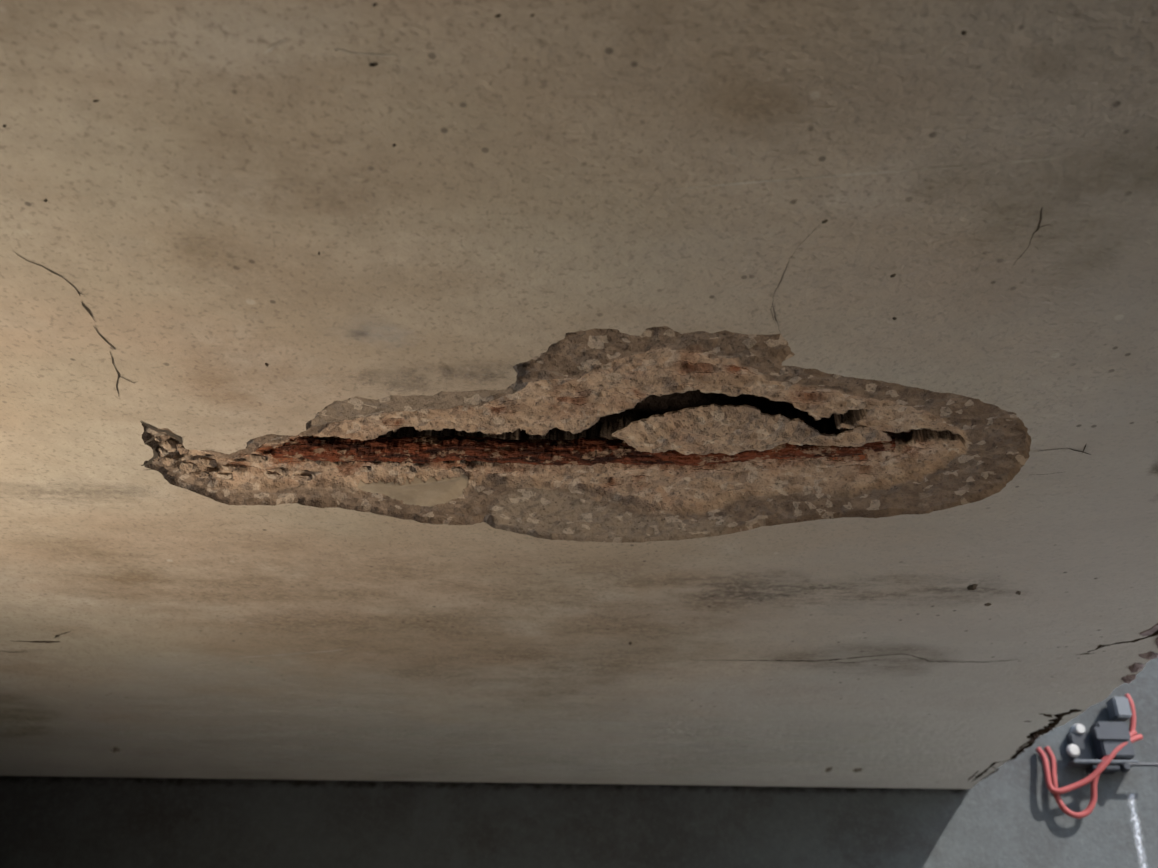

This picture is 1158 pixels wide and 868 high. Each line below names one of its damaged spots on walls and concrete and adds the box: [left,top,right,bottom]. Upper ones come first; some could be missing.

crack [14,252,135,396]
spalling [140,326,1032,543]
crack [711,654,964,663]
crack [1079,624,1158,655]
crack [969,709,1083,781]